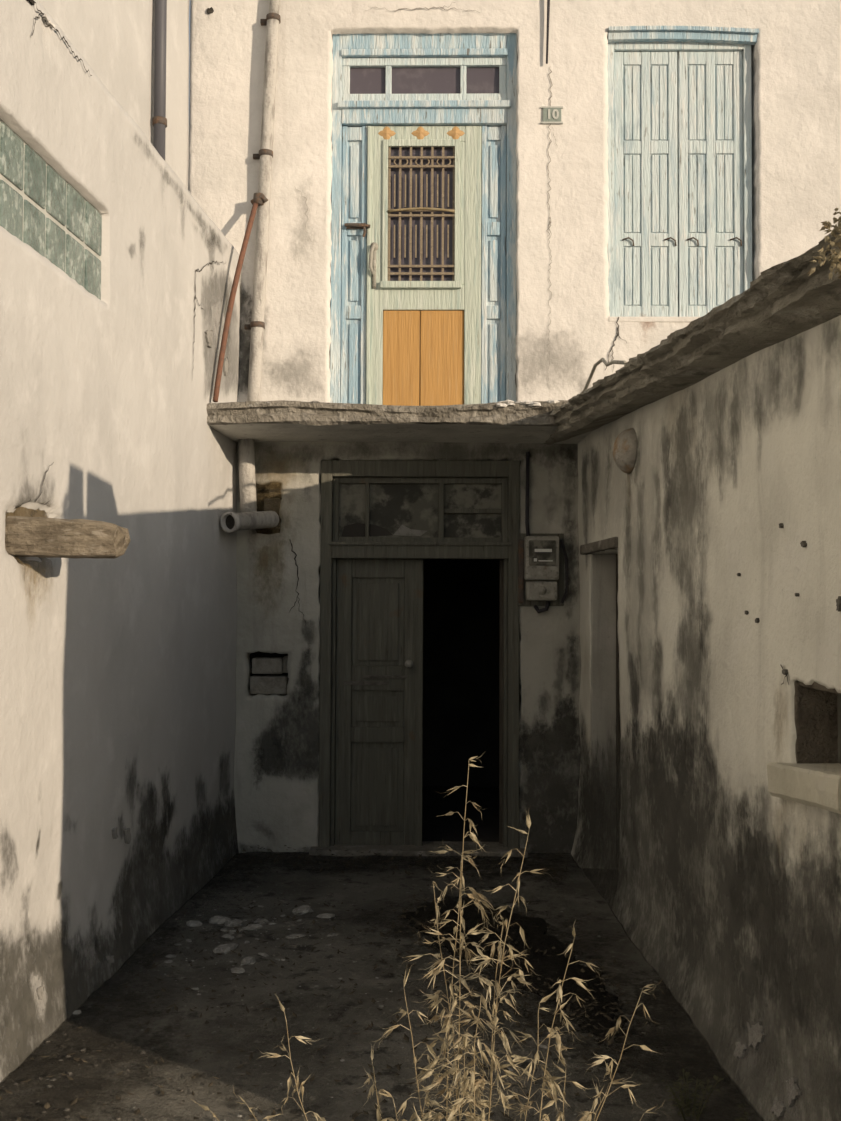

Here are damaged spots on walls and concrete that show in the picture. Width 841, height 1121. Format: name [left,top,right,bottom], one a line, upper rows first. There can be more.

crack [366,2,480,13]
crack [547,68,557,379]
crack [605,317,627,370]
leakage [668,399,700,525]
crack [289,539,306,625]
leakage [255,627,319,779]
leakage [519,557,841,1121]
leakage [0,769,239,1081]